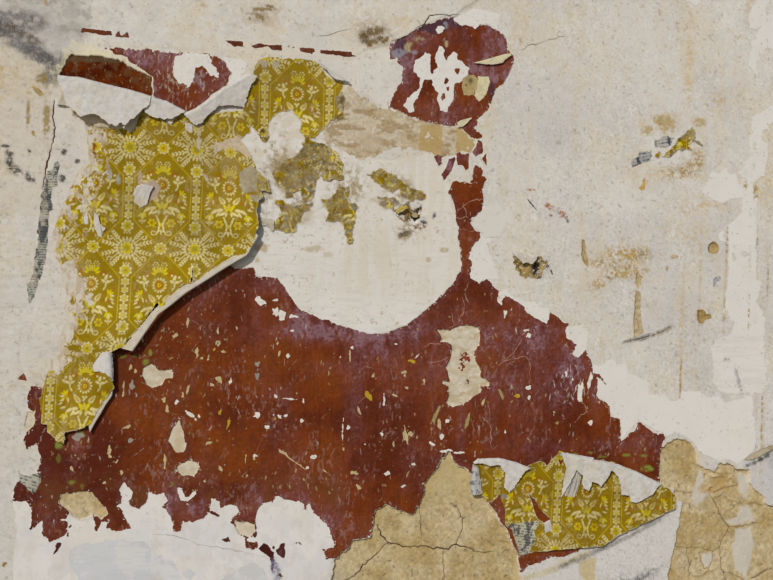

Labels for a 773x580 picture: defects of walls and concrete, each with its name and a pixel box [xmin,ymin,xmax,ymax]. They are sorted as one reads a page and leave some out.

peeling [60,47,247,112]
peeling [388,8,514,180]
peeling [13,165,773,580]
crack [347,506,504,580]
crack [686,498,771,579]